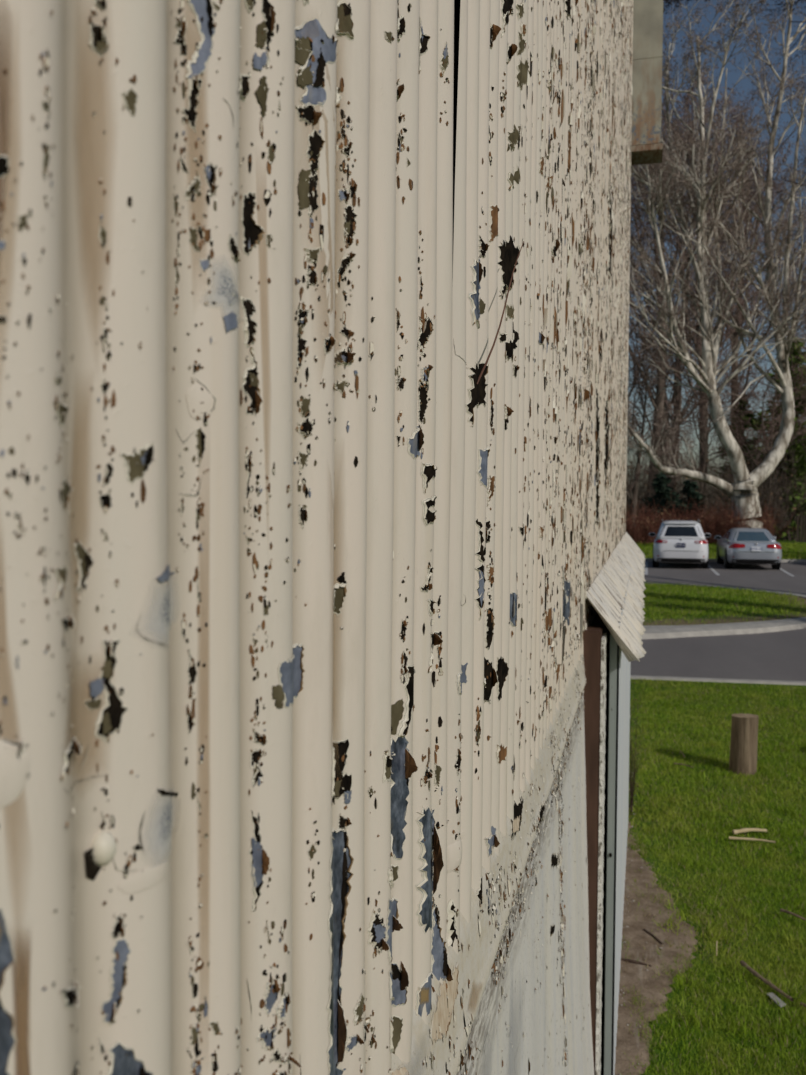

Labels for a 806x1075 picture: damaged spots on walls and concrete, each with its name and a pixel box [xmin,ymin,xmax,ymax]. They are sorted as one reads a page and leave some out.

peeling [174,0,221,132]
peeling [239,0,281,119]
peeling [295,0,354,218]
peeling [468,204,520,378]
peeling [54,541,94,601]
peeling [84,639,129,744]
peeling [272,642,305,709]
peeling [367,620,459,1054]
peeling [0,907,17,1075]
peeling [101,914,131,1026]
peeling [98,1037,154,1075]
peeling [326,738,376,1075]